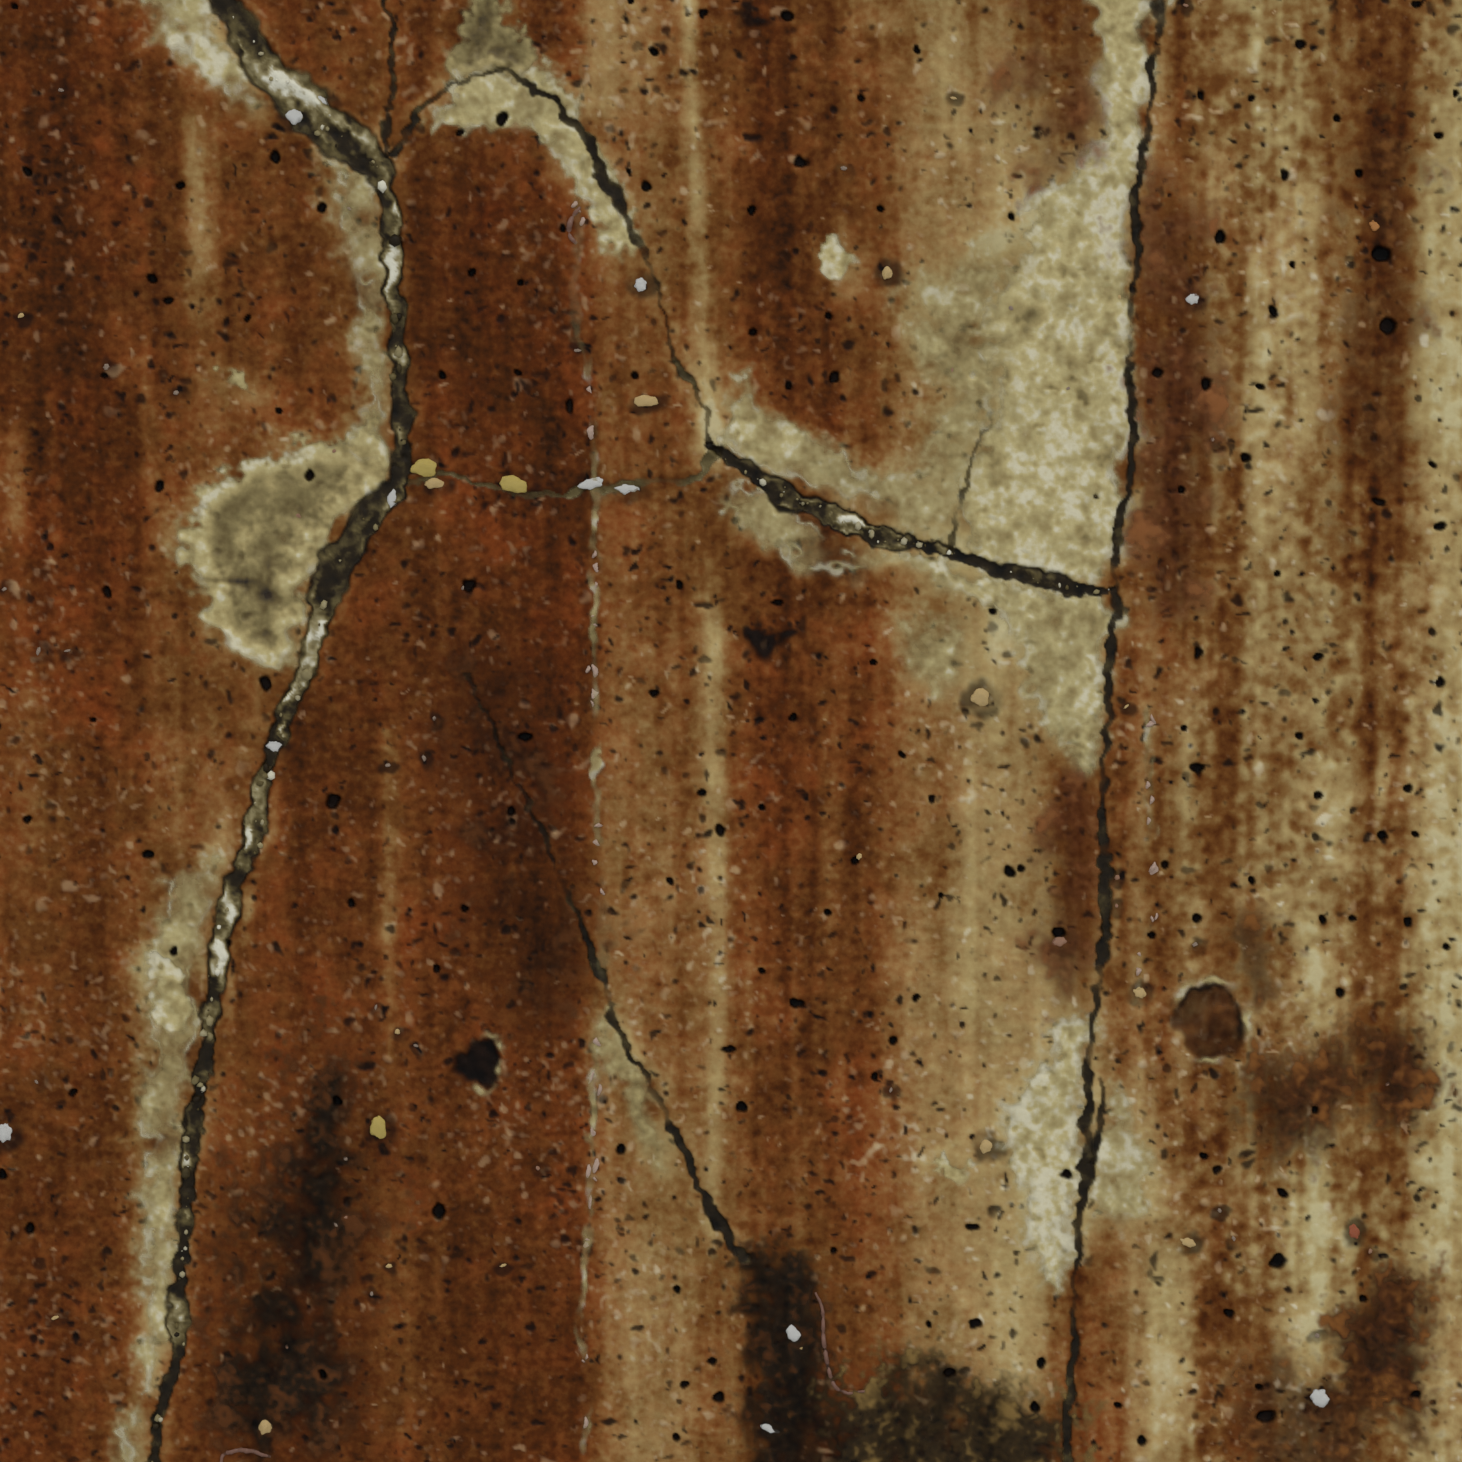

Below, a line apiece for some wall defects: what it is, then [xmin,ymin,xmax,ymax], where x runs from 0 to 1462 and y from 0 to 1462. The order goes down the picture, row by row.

crack [1128,0,1165,315]
corrosion [1139,159,1220,298]
corrosion [1123,341,1234,574]
crack [148,0,648,1462]
crack [535,345,1139,1270]
corrosion [1233,1017,1454,1164]
damp [743,1292,1103,1462]
crack [1062,1309,1080,1462]
corrosion [1226,1259,1444,1462]